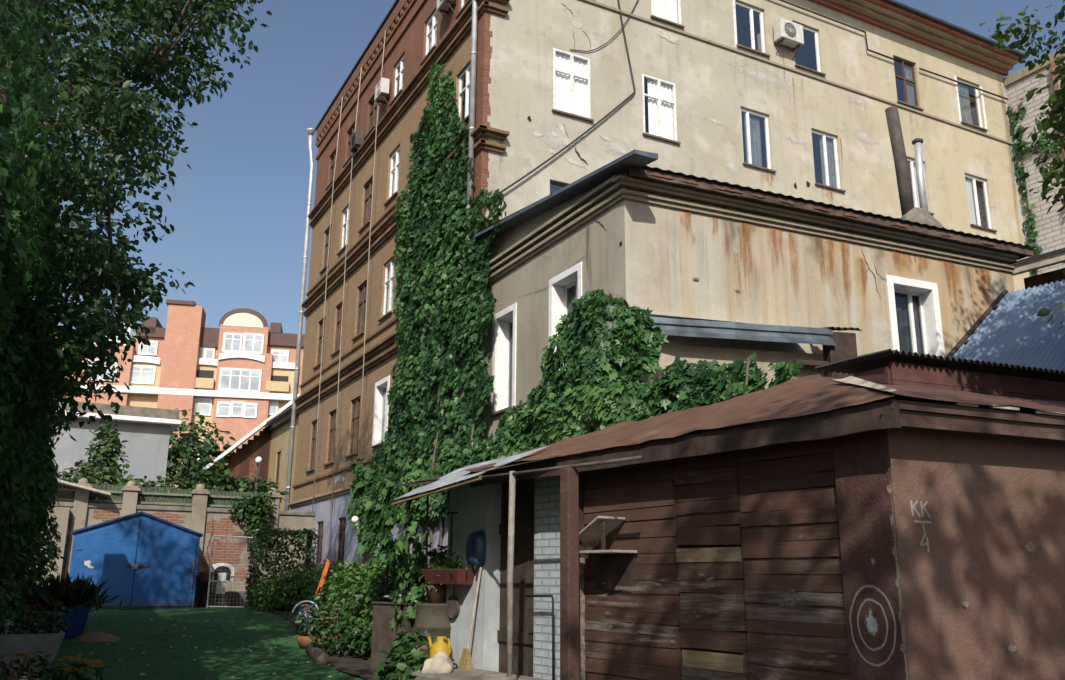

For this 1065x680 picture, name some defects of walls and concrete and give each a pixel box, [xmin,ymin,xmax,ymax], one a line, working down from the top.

peeling [533,122,585,168]
rust [818,239,848,285]
crack [861,248,886,296]